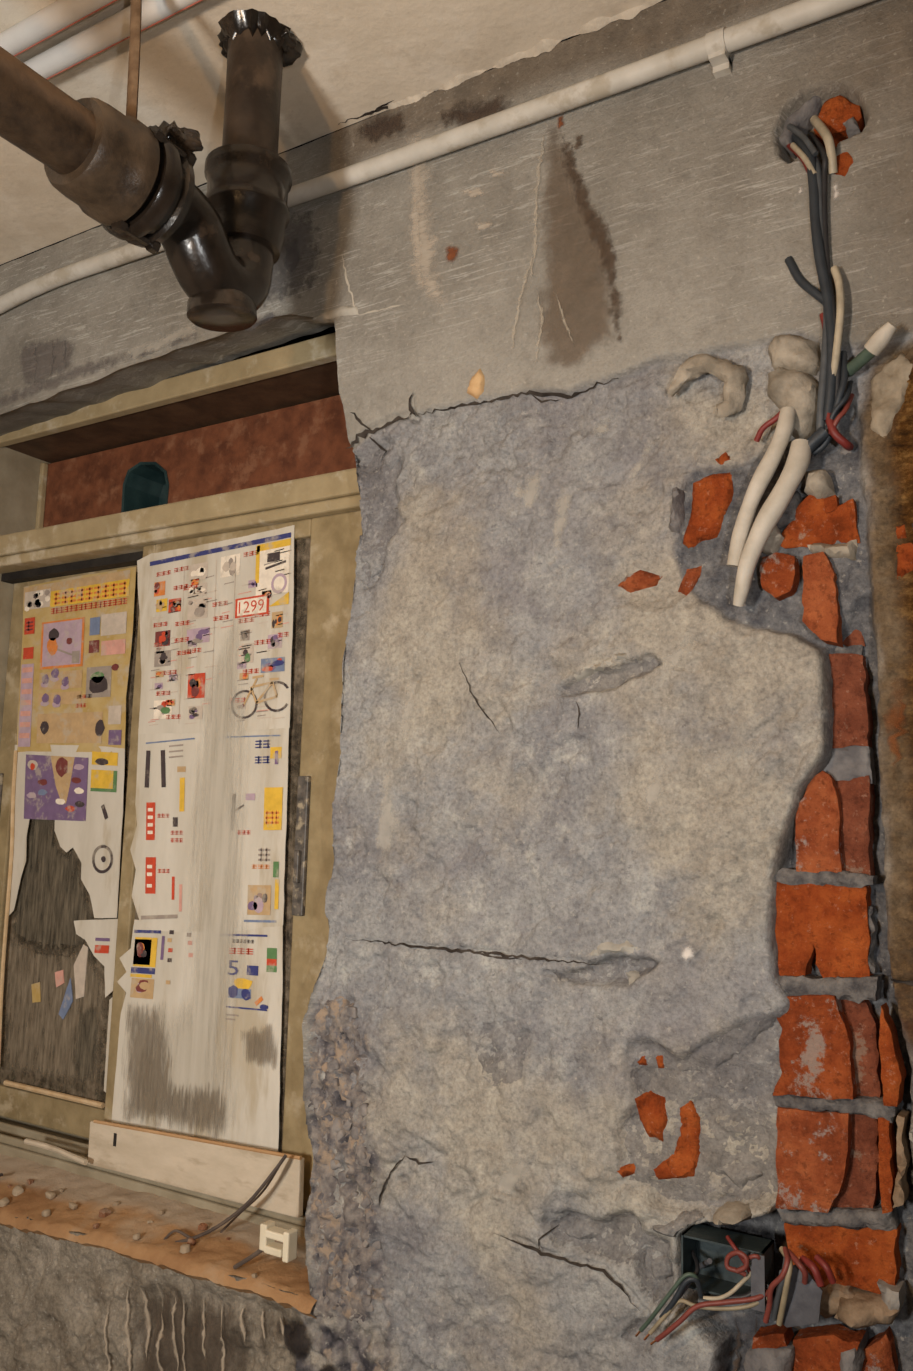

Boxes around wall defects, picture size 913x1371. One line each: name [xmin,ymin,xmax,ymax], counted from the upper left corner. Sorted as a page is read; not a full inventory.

water stain [512,135,621,362]
crack [345,378,619,462]
flaking render [668,452,734,549]
crack [353,940,610,965]
flaking render [550,469,913,1371]
crack [494,1225,637,1308]